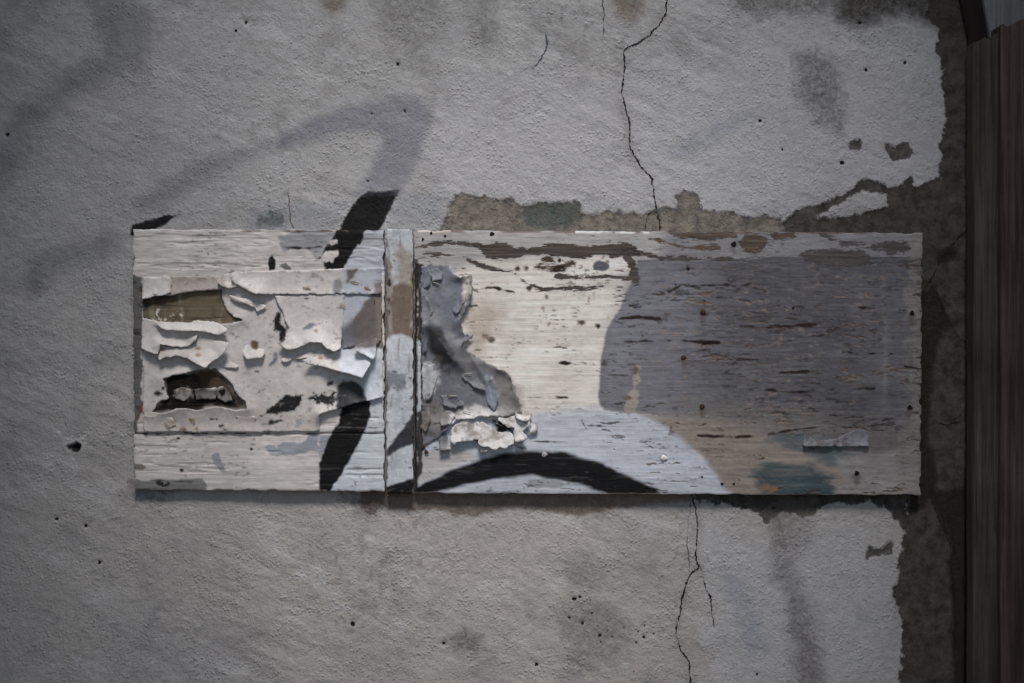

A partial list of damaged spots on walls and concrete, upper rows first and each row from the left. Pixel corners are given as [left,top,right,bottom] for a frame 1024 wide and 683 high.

crack [602,0,668,232]
peeling [418,1,967,683]
crack [675,494,714,683]